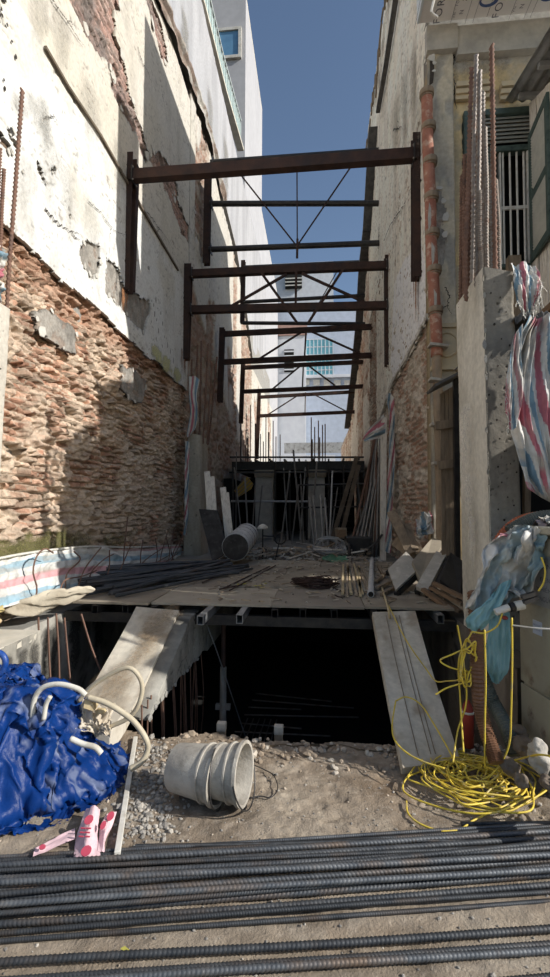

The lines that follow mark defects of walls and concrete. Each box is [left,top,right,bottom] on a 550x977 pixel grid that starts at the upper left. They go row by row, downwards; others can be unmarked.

flaking render [69,0,169,167]
flaking render [163,182,203,240]
flaking render [79,239,174,364]